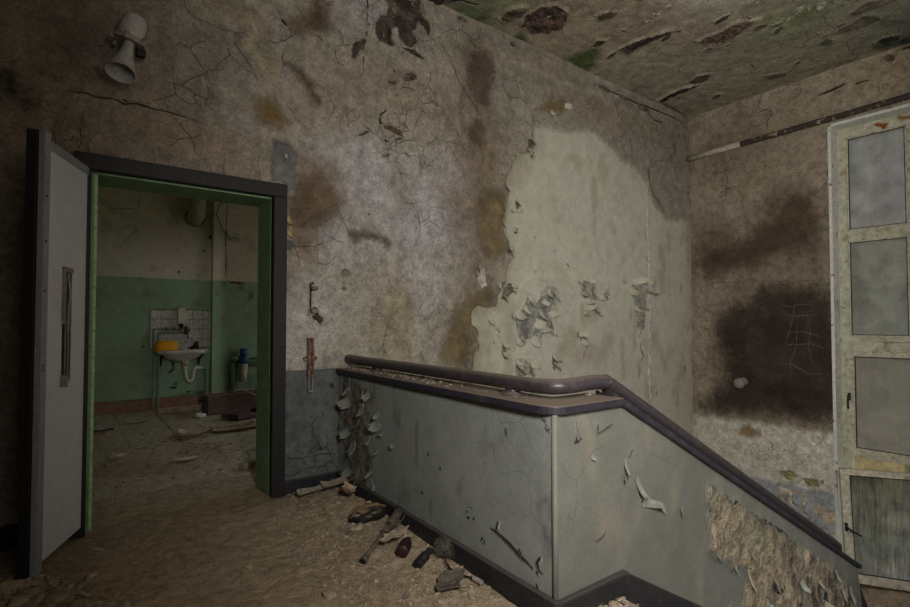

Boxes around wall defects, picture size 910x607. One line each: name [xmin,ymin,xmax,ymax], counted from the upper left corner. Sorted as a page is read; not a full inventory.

crack [268,0,370,76]
spalling [346,0,448,88]
spalling [588,4,683,60]
spalling [694,0,828,51]
spalling [815,0,910,64]
crack [63,90,195,120]
peeling [499,282,563,377]
peeling [578,275,611,316]
peeling [622,276,660,337]
water stain [700,289,833,420]
peeling [622,458,668,514]
peeling [703,470,858,607]